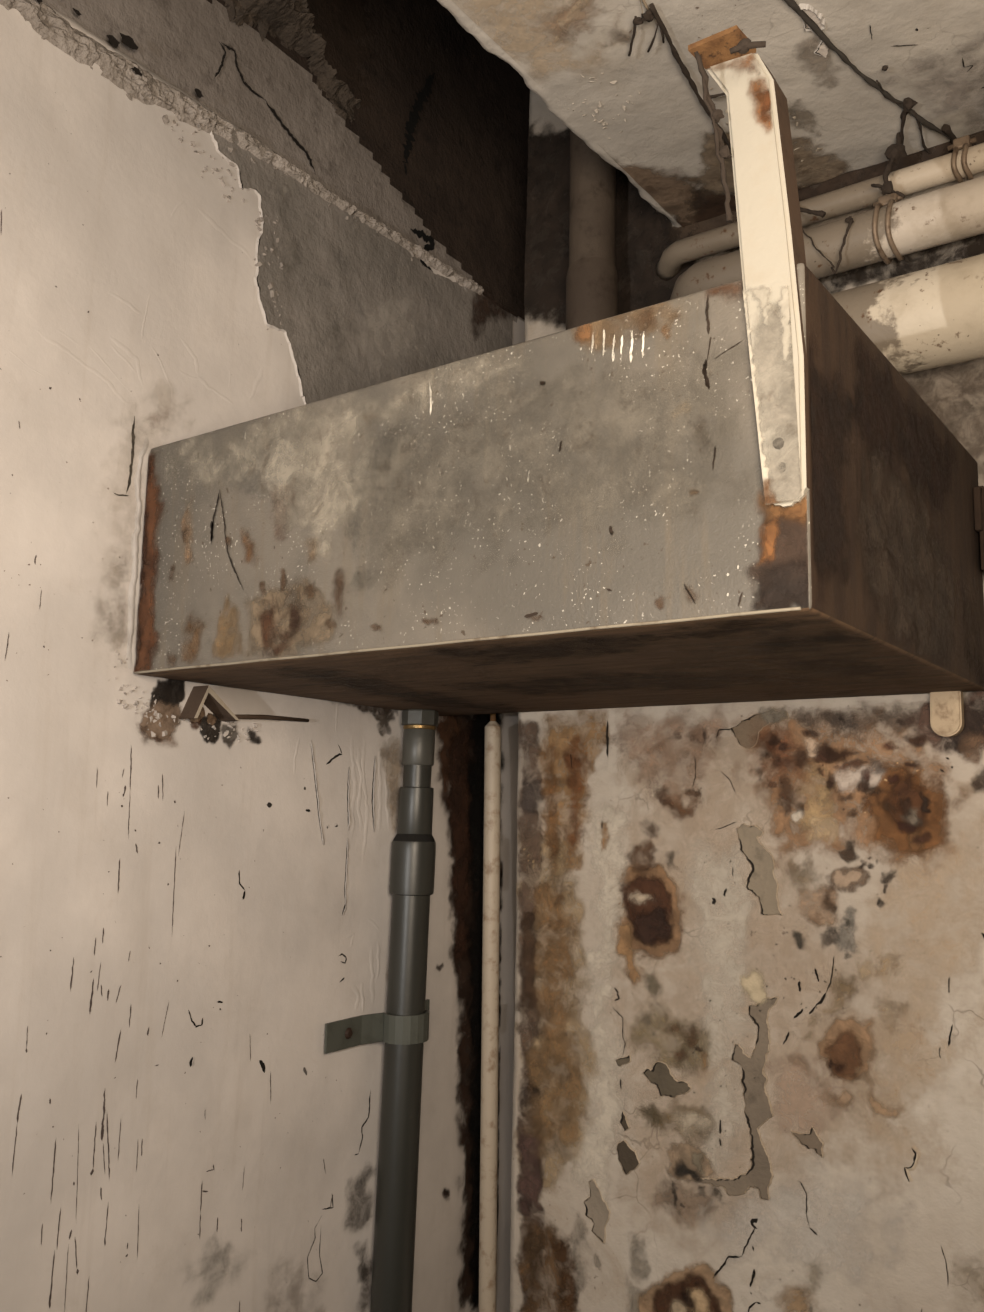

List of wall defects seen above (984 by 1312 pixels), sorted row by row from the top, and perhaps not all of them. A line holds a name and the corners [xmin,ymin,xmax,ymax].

flaking render [0,0,513,405]
crack [114,416,135,496]
damp [762,703,927,757]
efflorescence [835,762,883,791]
mould [972,771,984,790]
crack [311,740,377,915]
damp [517,717,749,1312]
crack [355,1091,371,1155]
peeling [617,1111,641,1175]
peeling [643,1061,695,1098]
peeling [694,968,784,1200]
crack [307,1197,333,1282]